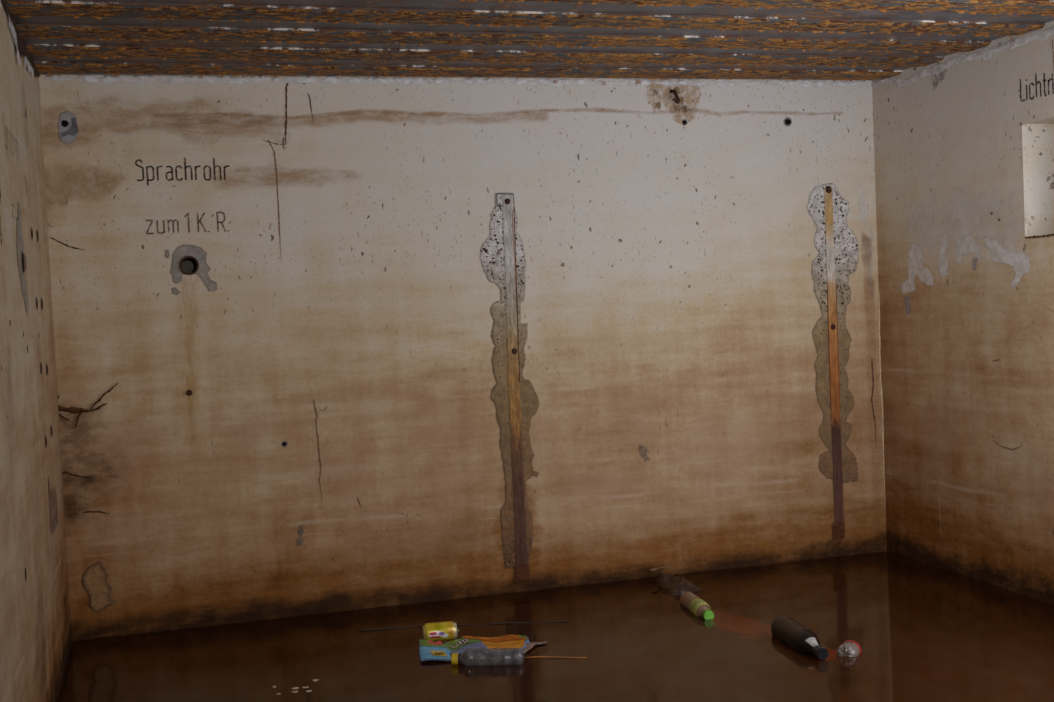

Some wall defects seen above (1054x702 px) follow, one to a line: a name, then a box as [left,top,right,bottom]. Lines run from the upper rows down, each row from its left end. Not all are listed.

rust [19,0,1054,122]
flaking render [480,194,539,568]
flaking render [807,183,859,483]
peeling [901,235,1030,314]